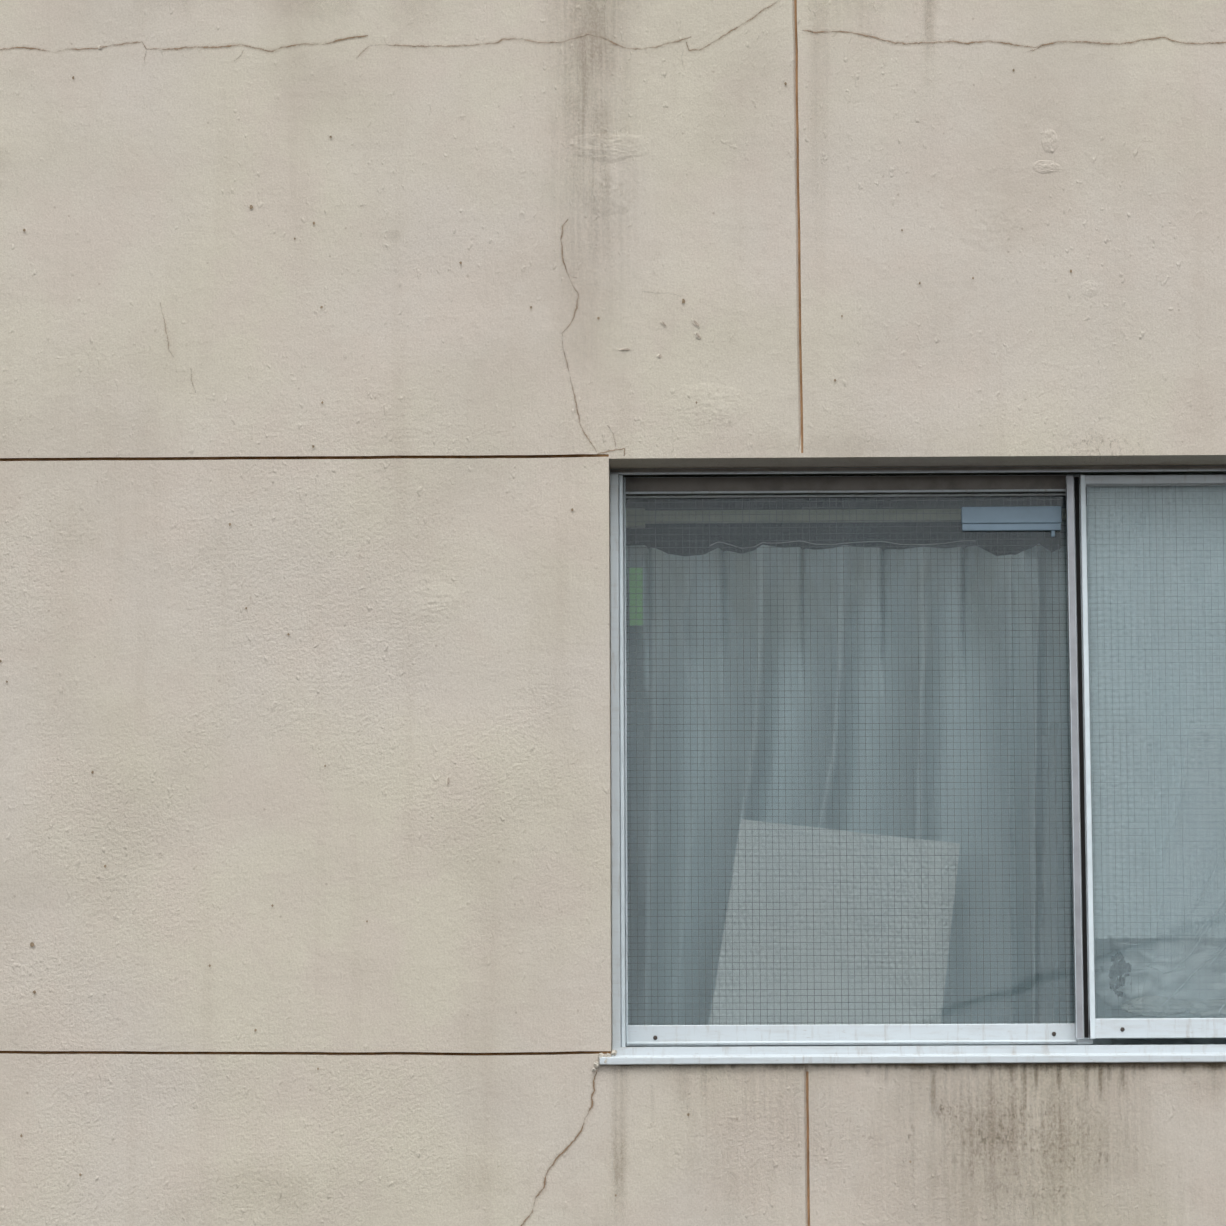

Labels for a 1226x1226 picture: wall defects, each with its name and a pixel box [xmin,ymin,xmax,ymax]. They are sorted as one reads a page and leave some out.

crack [74,42,299,52]
crack [657,4,773,51]
crack [804,30,1226,47]
crack [574,394,625,455]
crack [521,1072,597,1226]